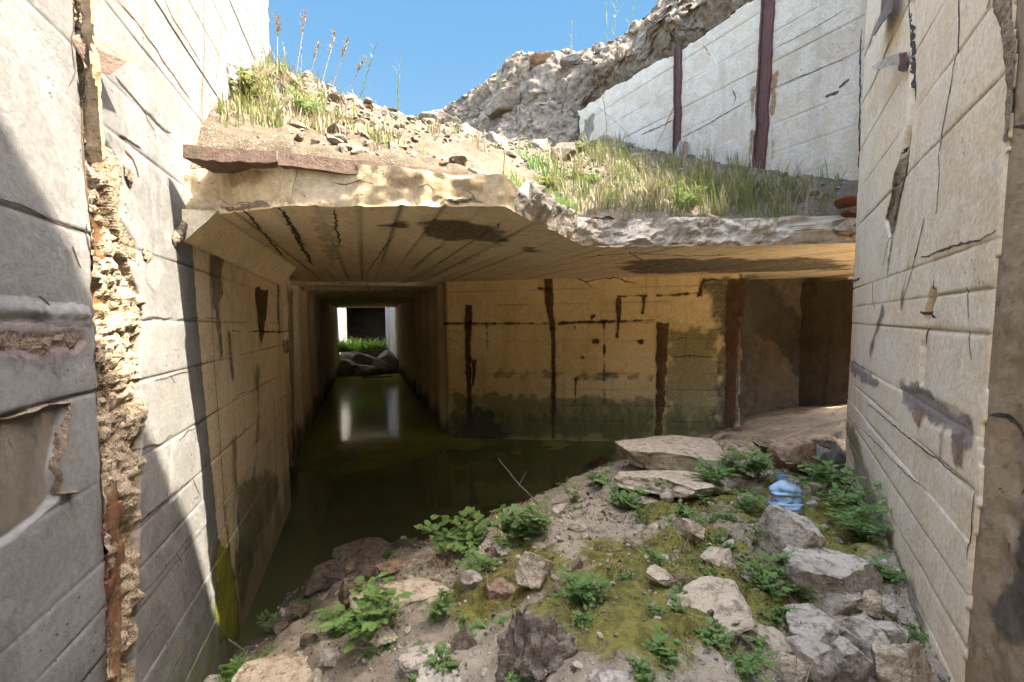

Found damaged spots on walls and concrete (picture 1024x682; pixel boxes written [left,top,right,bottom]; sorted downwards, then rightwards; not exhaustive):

crack [215,170,314,266]
crack [641,90,750,137]
crack [776,1,917,168]
spalling [886,152,910,235]
crack [903,0,996,343]
peeling [0,402,79,533]
spalling [73,0,153,682]
rust [255,287,268,344]
rust [444,278,746,439]
water stain [850,361,878,387]
water stain [899,380,972,449]
rust [103,483,122,678]